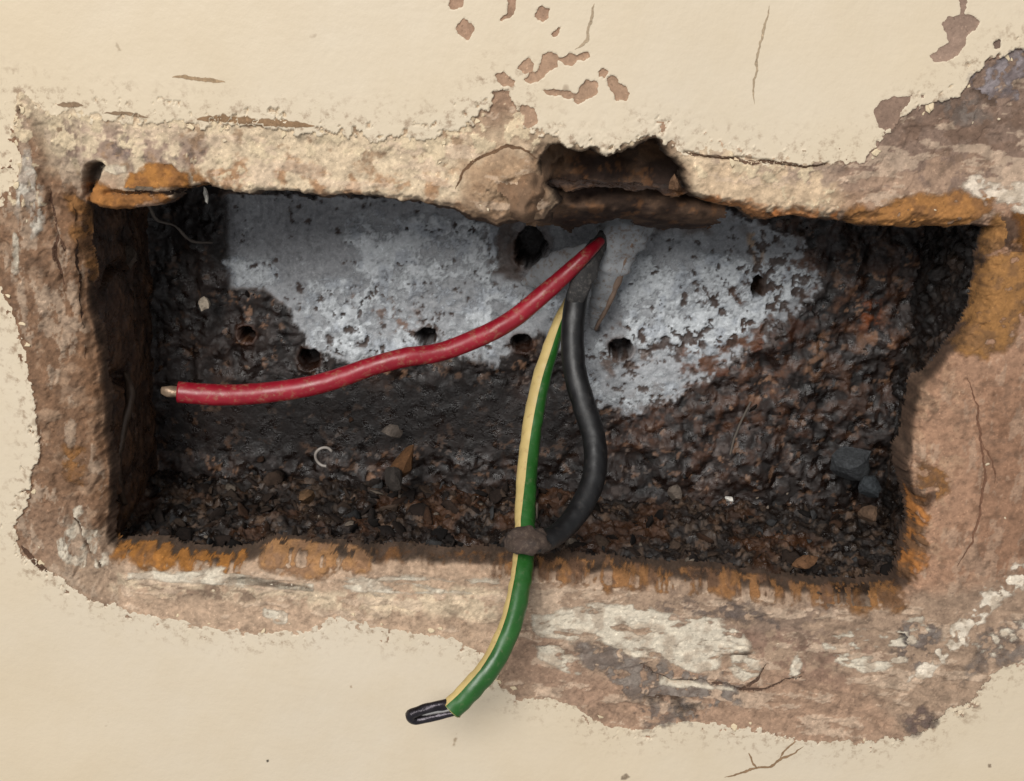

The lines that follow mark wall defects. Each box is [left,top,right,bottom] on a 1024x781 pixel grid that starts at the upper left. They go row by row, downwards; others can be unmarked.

peeling [448,0,475,40]
peeling [500,0,516,21]
crack [752,9,769,104]
peeling [930,0,980,62]
crack [683,151,825,168]
corrosion [63,163,213,280]
spalling [0,48,1024,654]
peeling [495,197,1024,746]
crack [957,379,996,566]
corrosion [110,533,400,580]
corrosion [532,463,949,614]
crack [641,663,801,691]